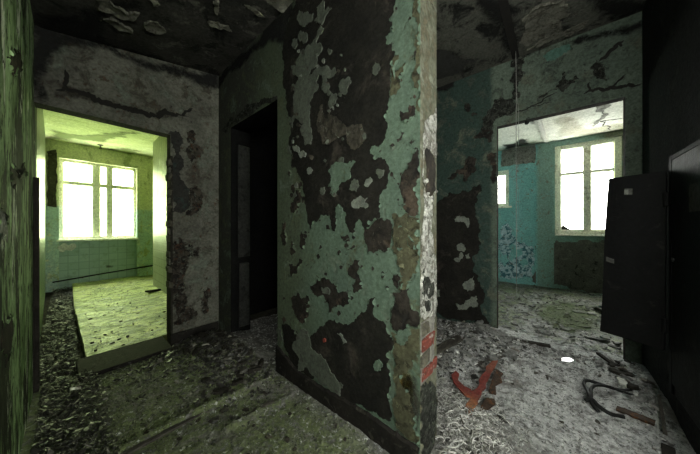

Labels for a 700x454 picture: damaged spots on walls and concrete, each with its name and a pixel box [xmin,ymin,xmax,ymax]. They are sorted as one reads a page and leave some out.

peeling [97,0,166,35]
peeling [207,0,232,32]
crack [56,69,193,119]
peeling [473,0,572,143]
crack [599,40,624,61]
crack [584,75,642,94]
peeling [165,130,212,336]
peeling [266,0,490,454]
peeling [498,223,536,285]
peeling [554,240,604,294]